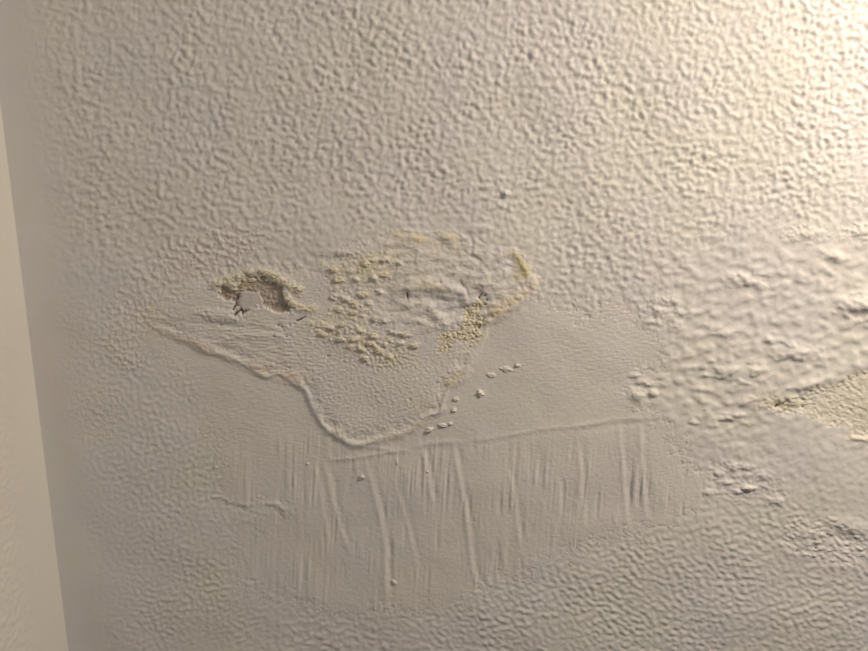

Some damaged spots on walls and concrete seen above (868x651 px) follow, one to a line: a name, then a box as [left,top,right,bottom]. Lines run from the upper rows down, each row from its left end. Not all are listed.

flaking render [762,369,868,444]